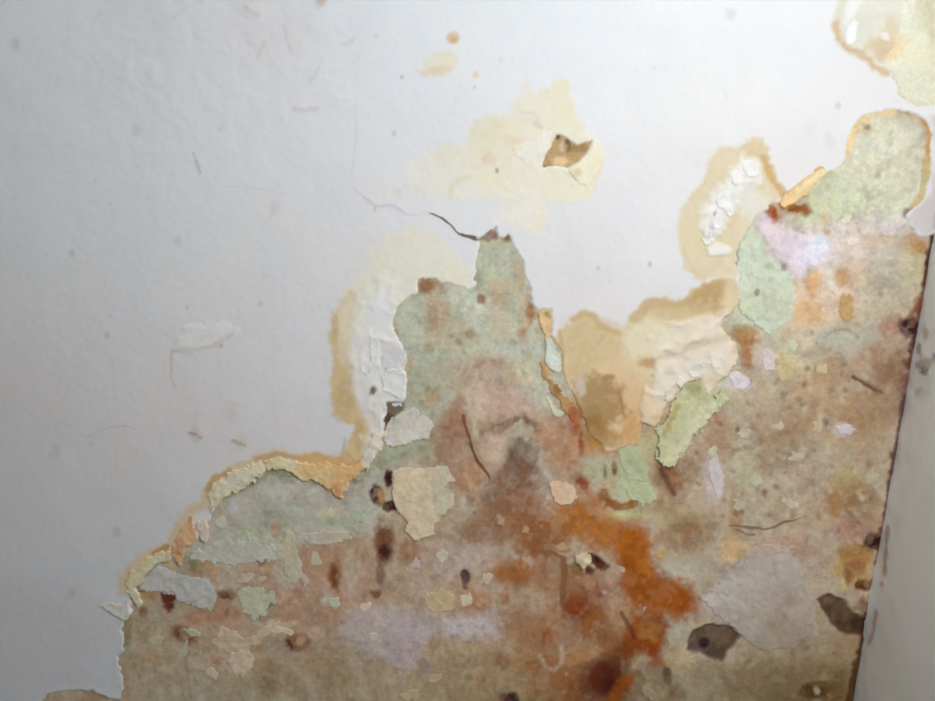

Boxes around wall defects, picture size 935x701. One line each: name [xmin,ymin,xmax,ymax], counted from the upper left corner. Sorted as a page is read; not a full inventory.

crack [351,113,479,241]
leakage [392,71,607,238]
spalling [543,134,592,168]
leakage [551,134,840,452]
leakage [115,222,476,600]
spalling [366,469,397,514]
peeling [388,465,456,540]
peeling [138,567,217,615]
spalling [367,517,422,600]
rust [575,511,704,701]
spalling [686,623,742,664]
peeling [701,550,819,651]